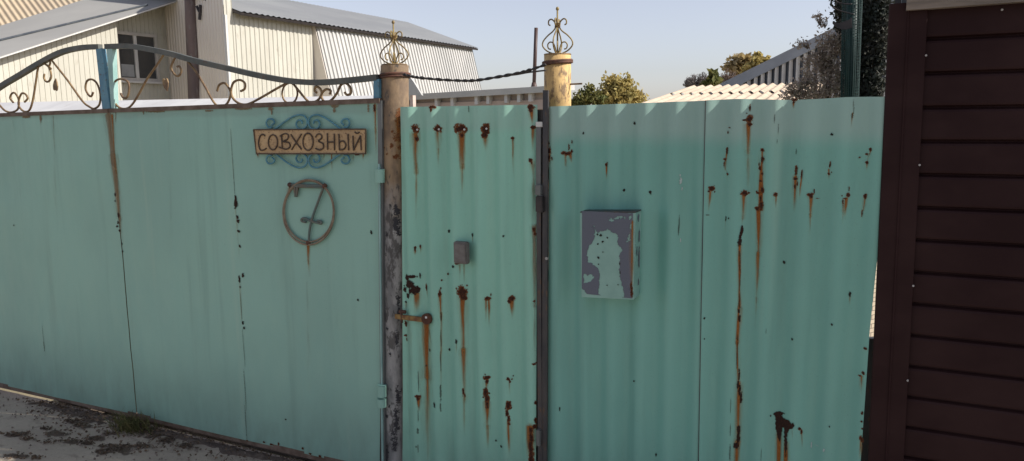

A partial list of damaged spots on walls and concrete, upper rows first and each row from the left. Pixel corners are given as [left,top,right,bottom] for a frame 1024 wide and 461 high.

corrosion [384,108,420,185]
corrosion [433,123,490,167]
corrosion [740,104,778,283]
corrosion [793,165,820,215]
corrosion [415,324,430,417]
corrosion [456,284,468,397]
corrosion [482,374,491,435]